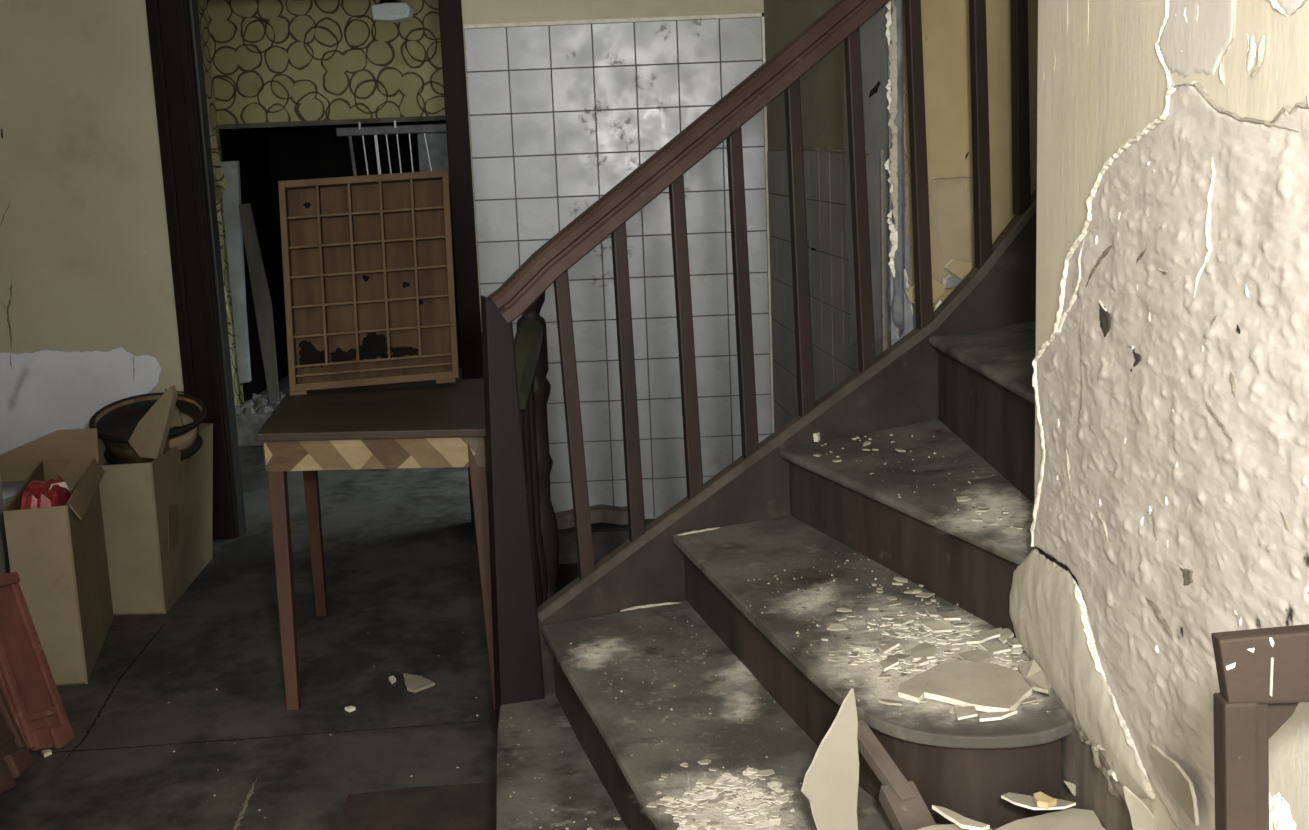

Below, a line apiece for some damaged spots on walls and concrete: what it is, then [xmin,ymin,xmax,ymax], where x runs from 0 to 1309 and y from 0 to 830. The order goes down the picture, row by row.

crack [1,284,12,349]
peeling [0,347,161,455]
peeling [956,0,1309,830]
crack [1034,546,1090,610]